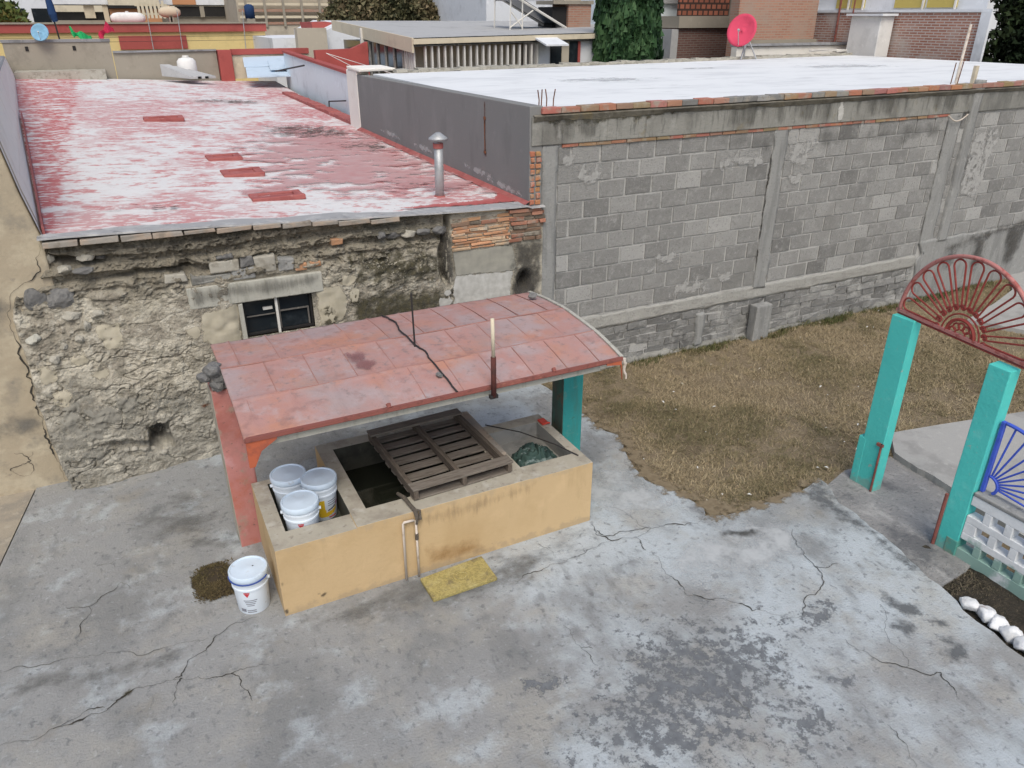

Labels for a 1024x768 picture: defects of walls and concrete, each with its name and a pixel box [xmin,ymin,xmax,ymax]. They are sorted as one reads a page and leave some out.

crack [7,245,65,479]
hole [124,423,170,454]
crack [522,512,835,618]
crack [7,557,266,743]
crack [845,606,957,694]